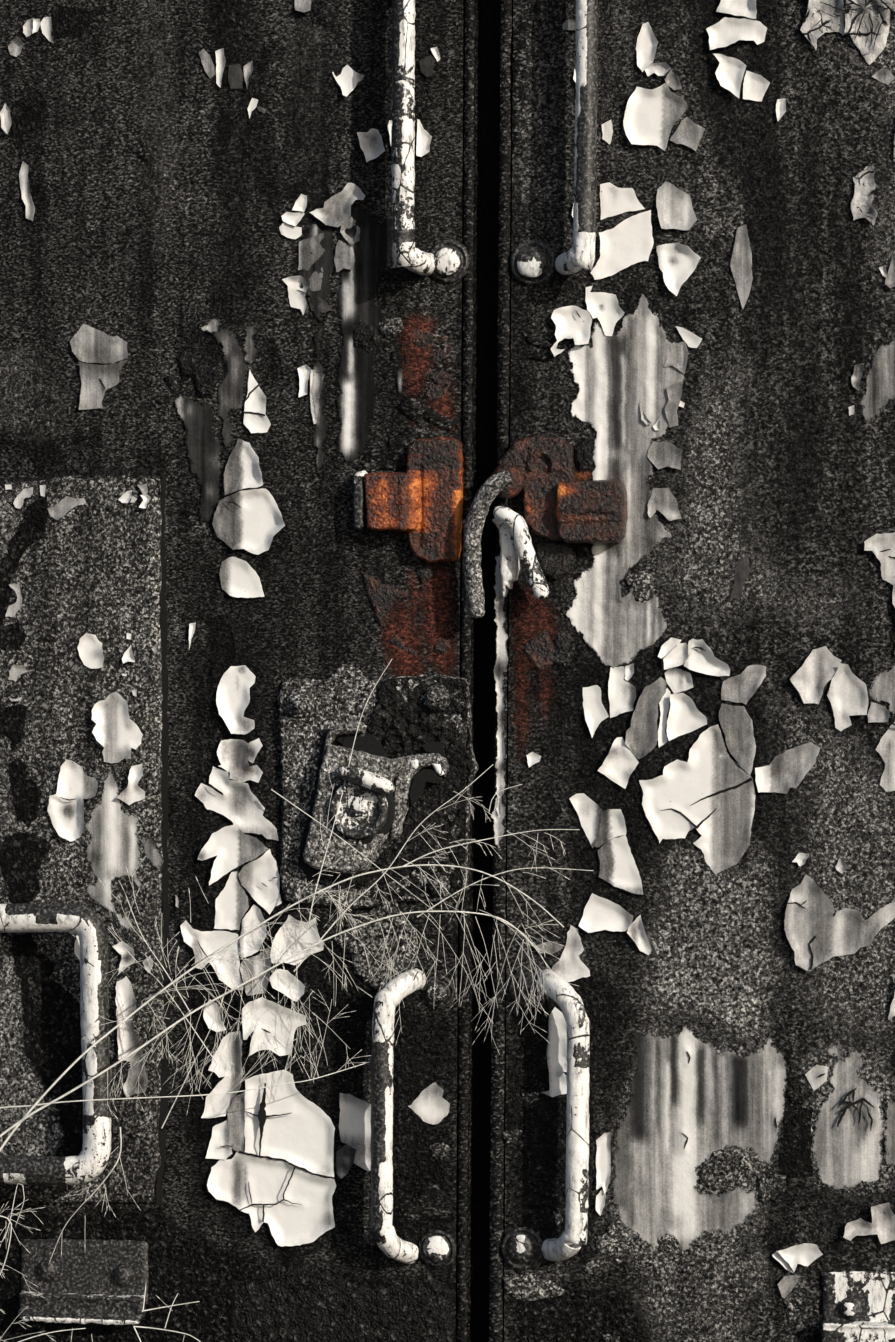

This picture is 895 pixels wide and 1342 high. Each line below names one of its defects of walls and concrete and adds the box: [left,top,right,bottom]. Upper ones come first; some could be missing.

crack [815,0,889,49]
peeling [175,319,285,598]
rust [352,314,459,471]
rust [573,438,594,480]
rust [361,563,453,658]
rust [516,589,571,738]
peeling [0,633,162,1098]
peeling [583,638,820,875]
crack [664,778,753,829]
peeling [176,665,371,1247]
crack [239,1083,334,1222]
peeling [596,1027,895,1250]